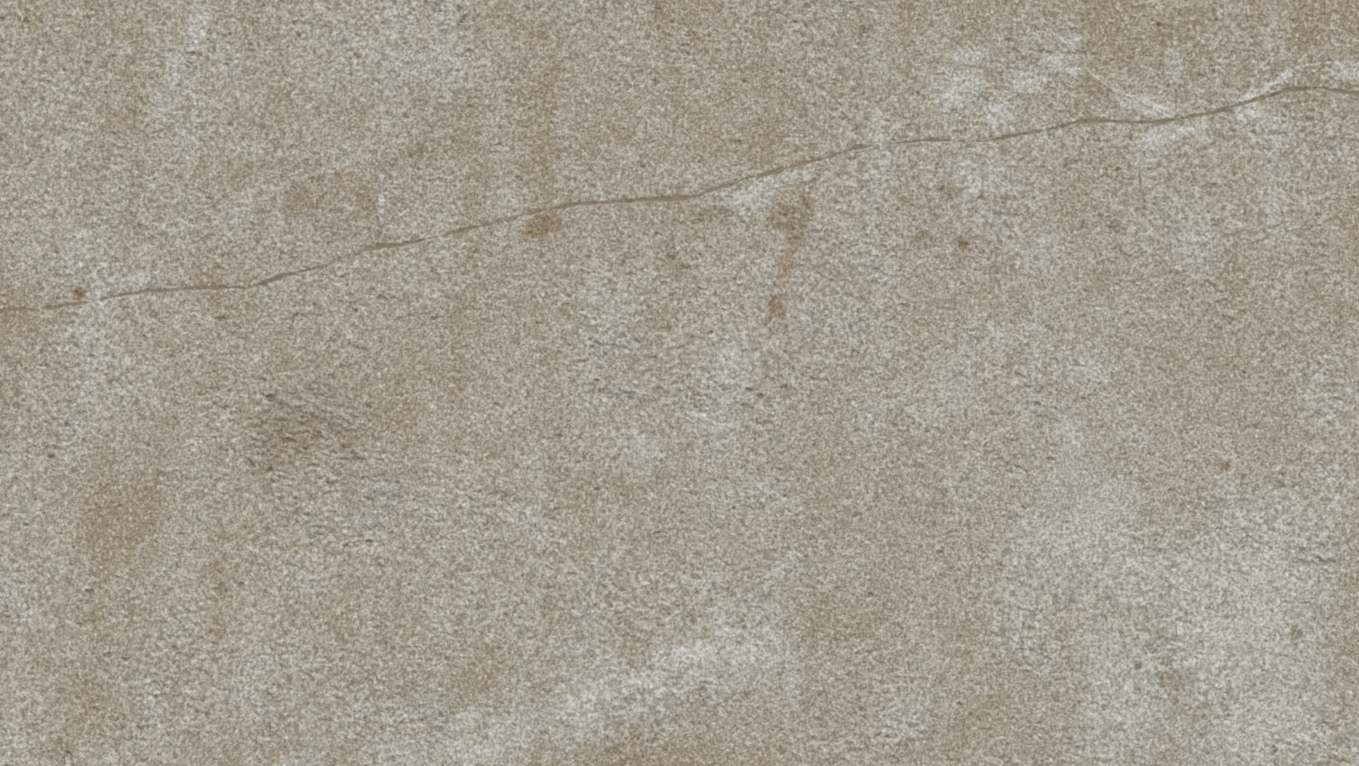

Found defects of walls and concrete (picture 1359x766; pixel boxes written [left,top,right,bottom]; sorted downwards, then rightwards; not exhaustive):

crack [0,70,1359,313]